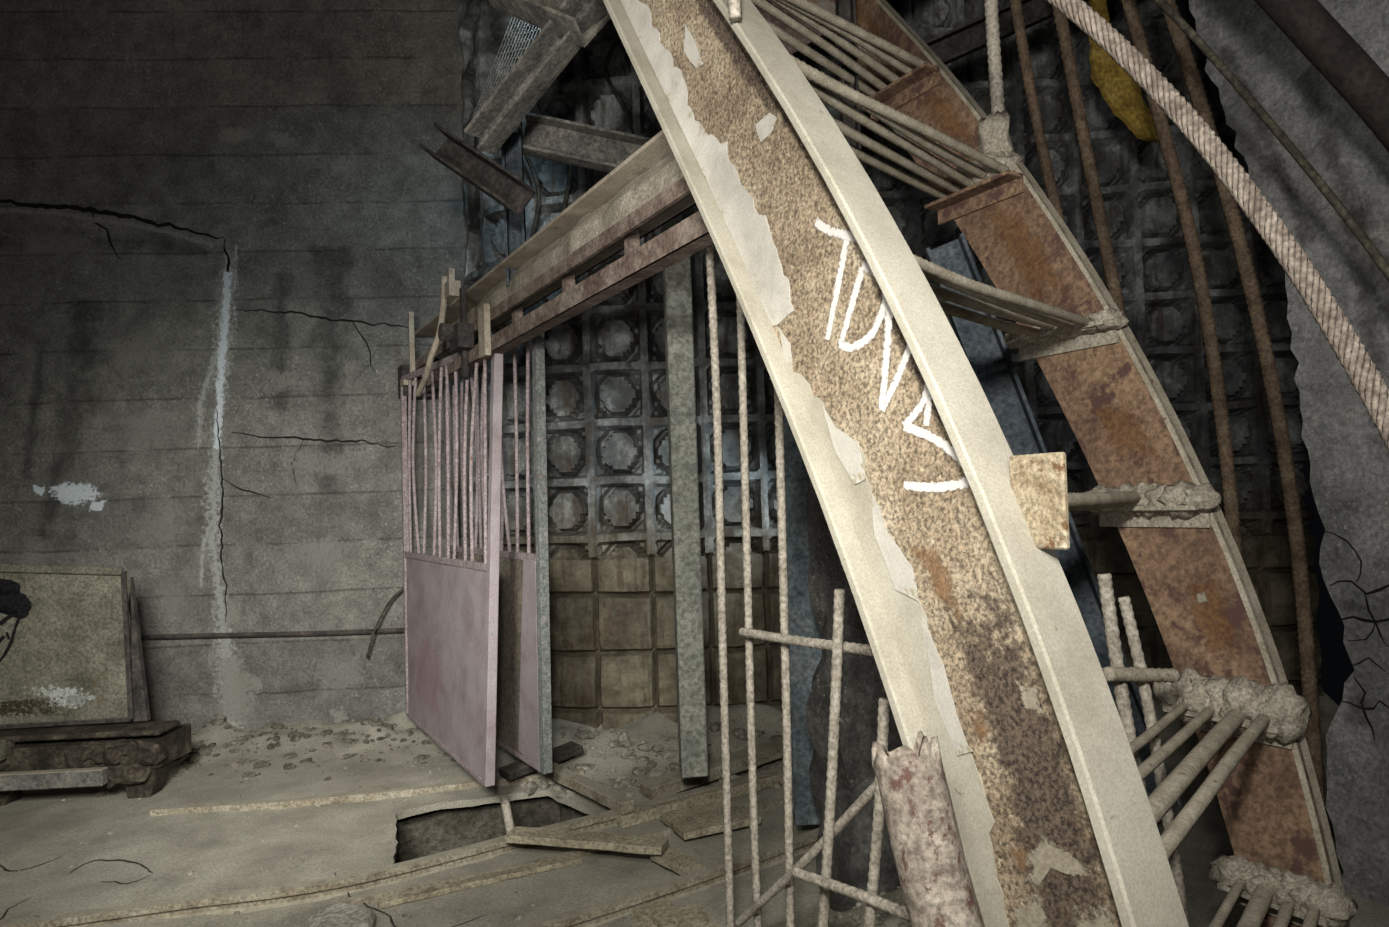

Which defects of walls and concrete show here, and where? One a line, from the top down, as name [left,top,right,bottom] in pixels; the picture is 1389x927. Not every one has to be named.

corrosion [696,0,786,125]
crack [0,199,417,373]
leakage [194,245,245,728]
peeling [620,0,1090,927]
corrosion [891,316,943,427]
spalling [395,796,589,863]
corrosion [915,549,1111,927]
crack [1321,530,1389,740]